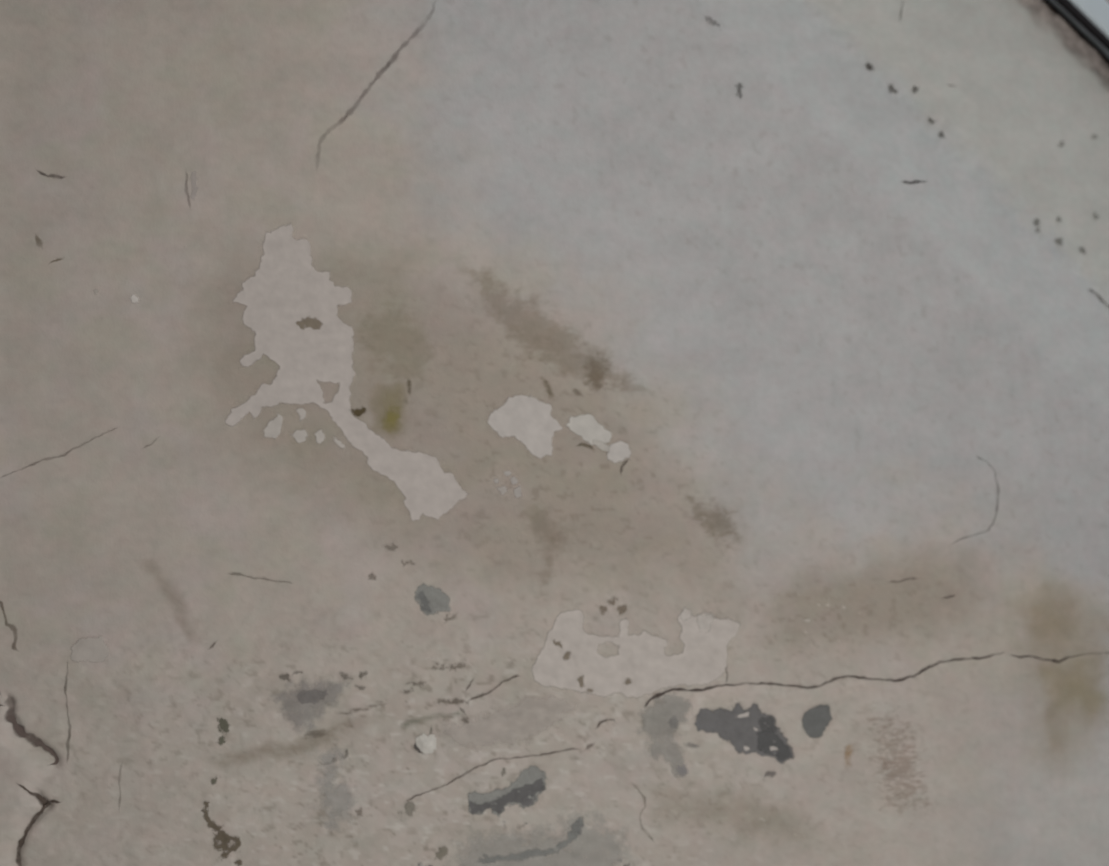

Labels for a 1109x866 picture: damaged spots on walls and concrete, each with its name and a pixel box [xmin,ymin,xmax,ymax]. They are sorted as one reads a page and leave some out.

peeling [225,224,468,521]
peeling [488,395,631,472]
peeling [532,599,794,777]
crack [645,652,1091,707]
crack [0,705,70,765]
flaking render [802,705,832,738]
crack [411,749,571,799]
flaking render [468,766,546,817]
crack [16,785,60,866]